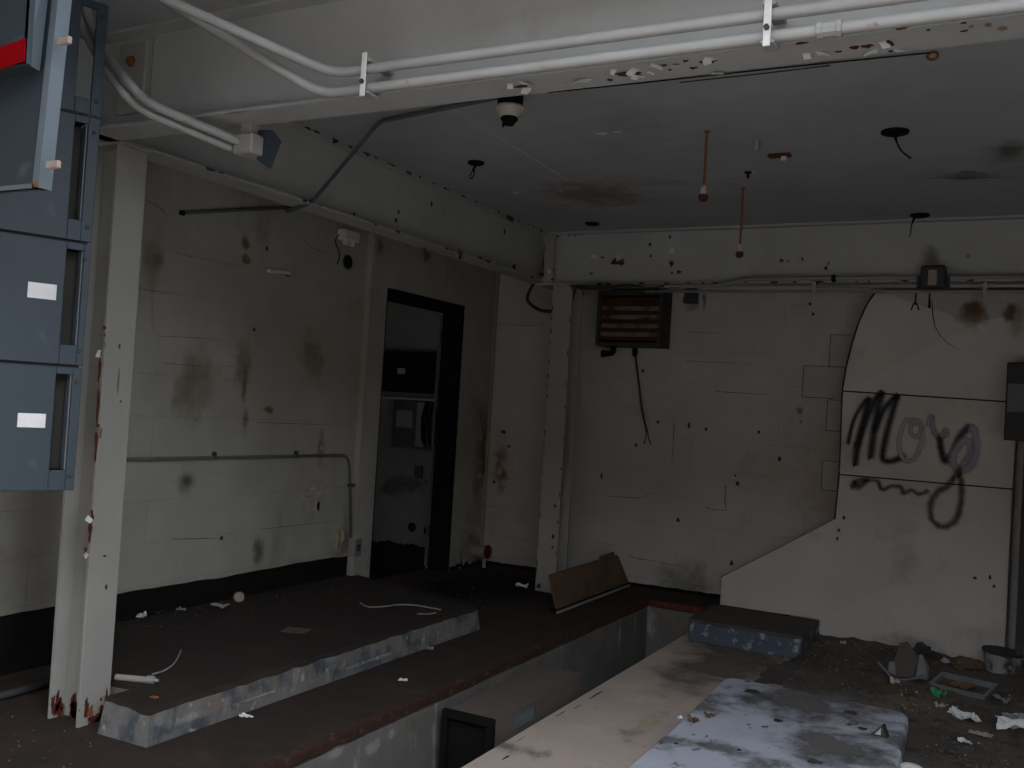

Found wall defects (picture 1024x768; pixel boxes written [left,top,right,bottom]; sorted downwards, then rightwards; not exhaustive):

peeling [796,27,907,60]
peeling [607,57,724,81]
corrosion [94,342,105,463]
corrosion [84,509,94,559]
corrosion [51,688,108,724]